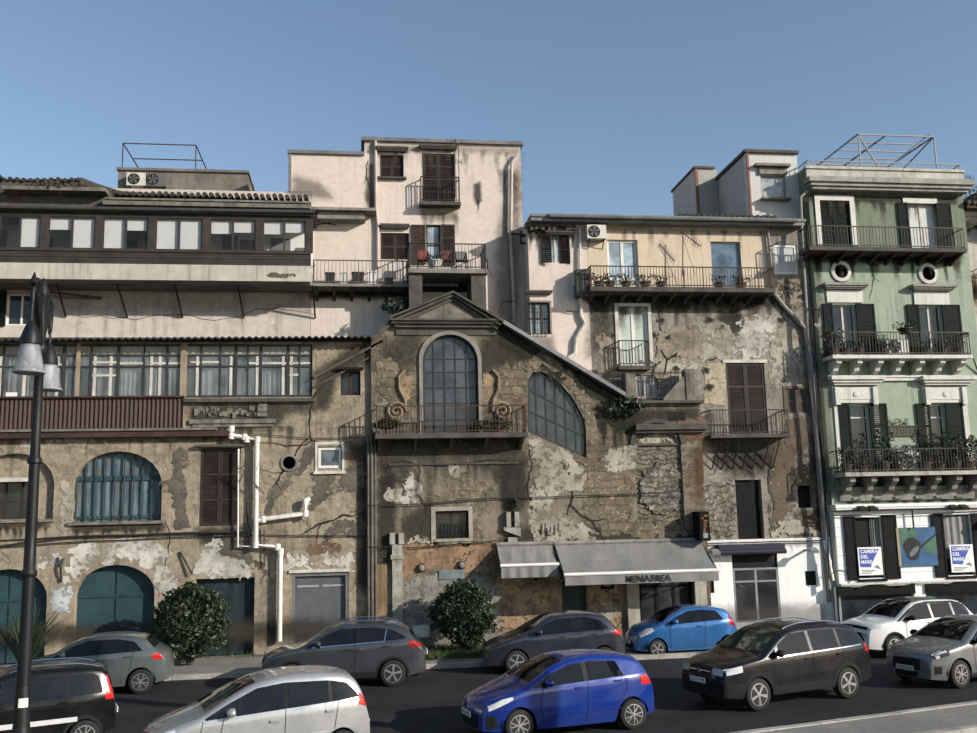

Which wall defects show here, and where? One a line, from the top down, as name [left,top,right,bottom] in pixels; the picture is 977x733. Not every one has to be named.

peeling [37,476,177,613]
peeling [193,529,270,581]
crack [260,391,319,499]
peeling [283,518,367,572]
crack [300,511,367,542]
peeling [383,472,423,506]
damp [350,441,526,589]
crack [384,443,631,540]
spalling [528,276,807,547]